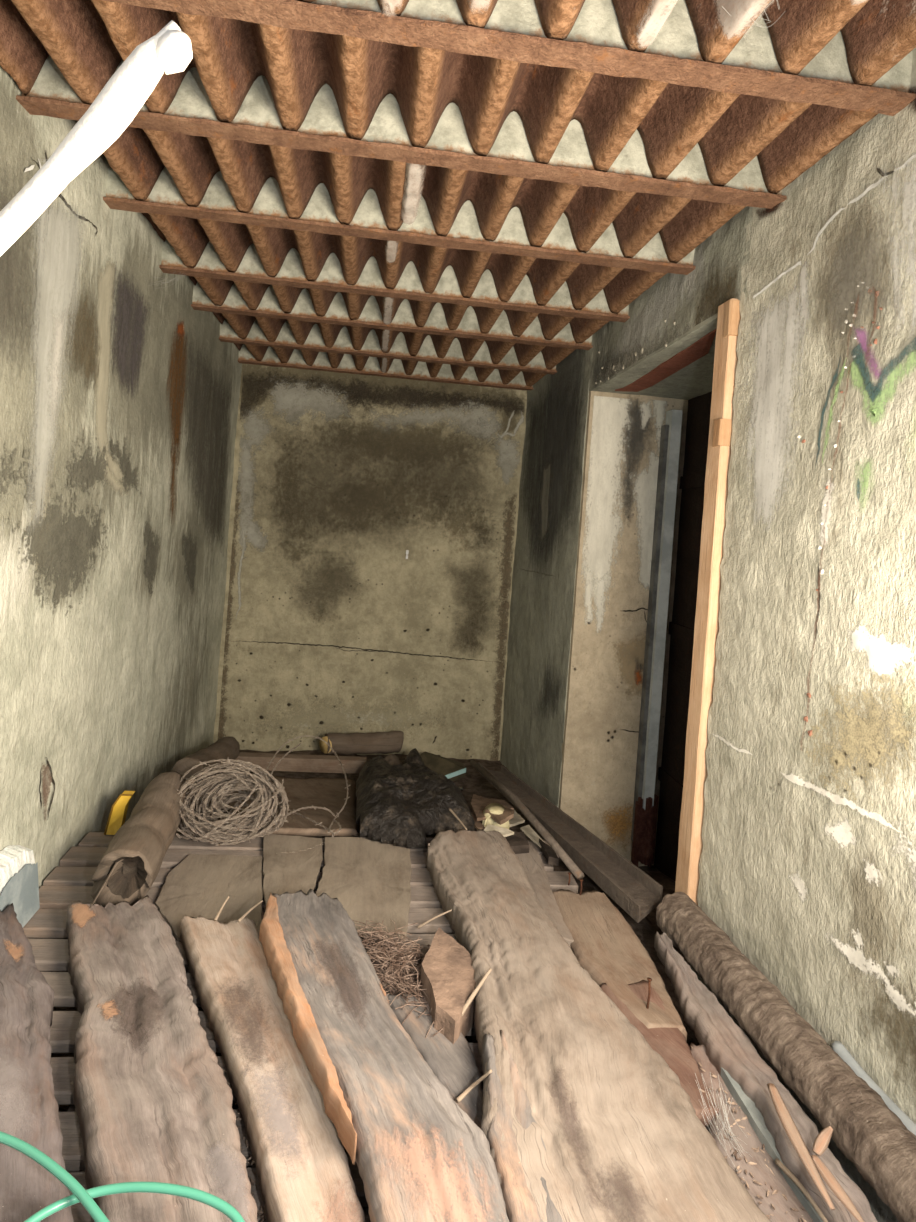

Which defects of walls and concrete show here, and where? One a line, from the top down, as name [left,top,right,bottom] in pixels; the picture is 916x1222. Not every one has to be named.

leakage [381,0,402,16]
crack [24,150,48,173]
crack [58,193,98,236]
leakage [401,163,424,224]
leakage [385,241,398,262]
leakage [0,202,150,615]
corrosion [167,324,186,516]
leakage [186,297,667,633]
crack [797,282,882,747]
leakage [144,520,160,598]
leakage [182,531,199,597]